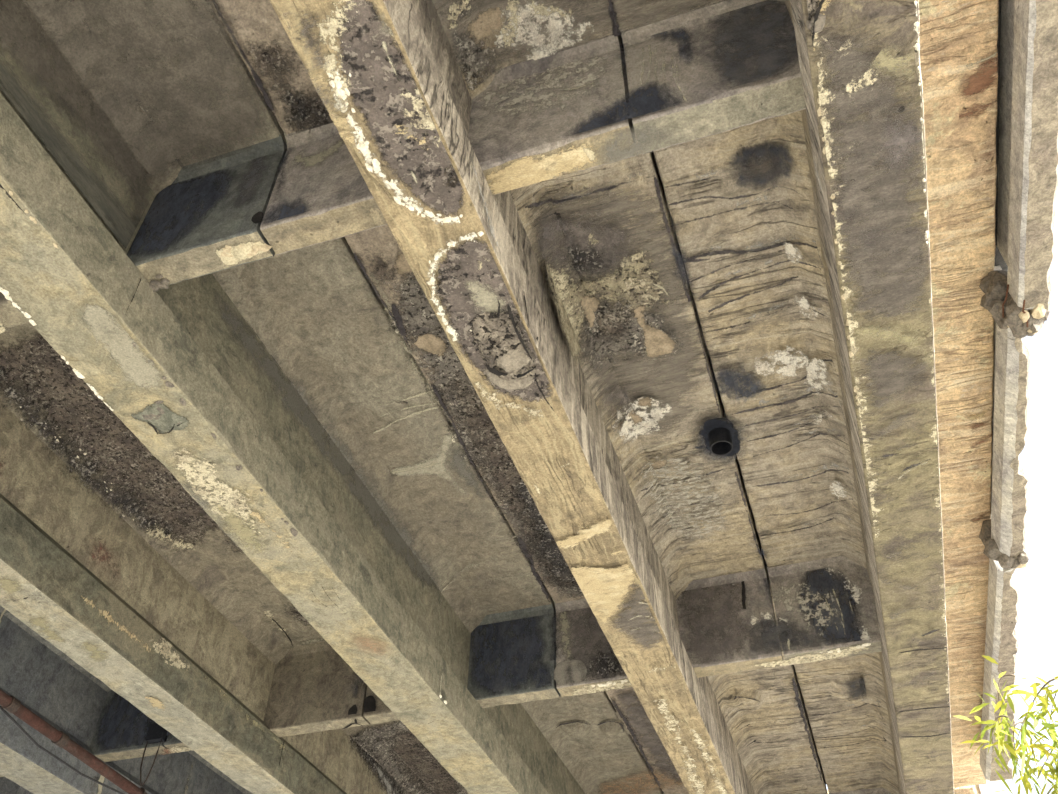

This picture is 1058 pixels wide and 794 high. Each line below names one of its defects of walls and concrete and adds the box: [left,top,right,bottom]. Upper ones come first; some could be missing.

water stain [440,0,610,117]
water stain [608,0,625,68]
water stain [707,0,801,86]
water stain [278,0,465,224]
water stain [427,171,552,417]
spalling [468,300,554,411]
peeling [580,294,600,328]
peeling [634,306,676,358]
water stain [543,29,939,560]
spalling [979,270,1050,338]
spalling [131,376,190,434]
spalling [146,527,196,550]